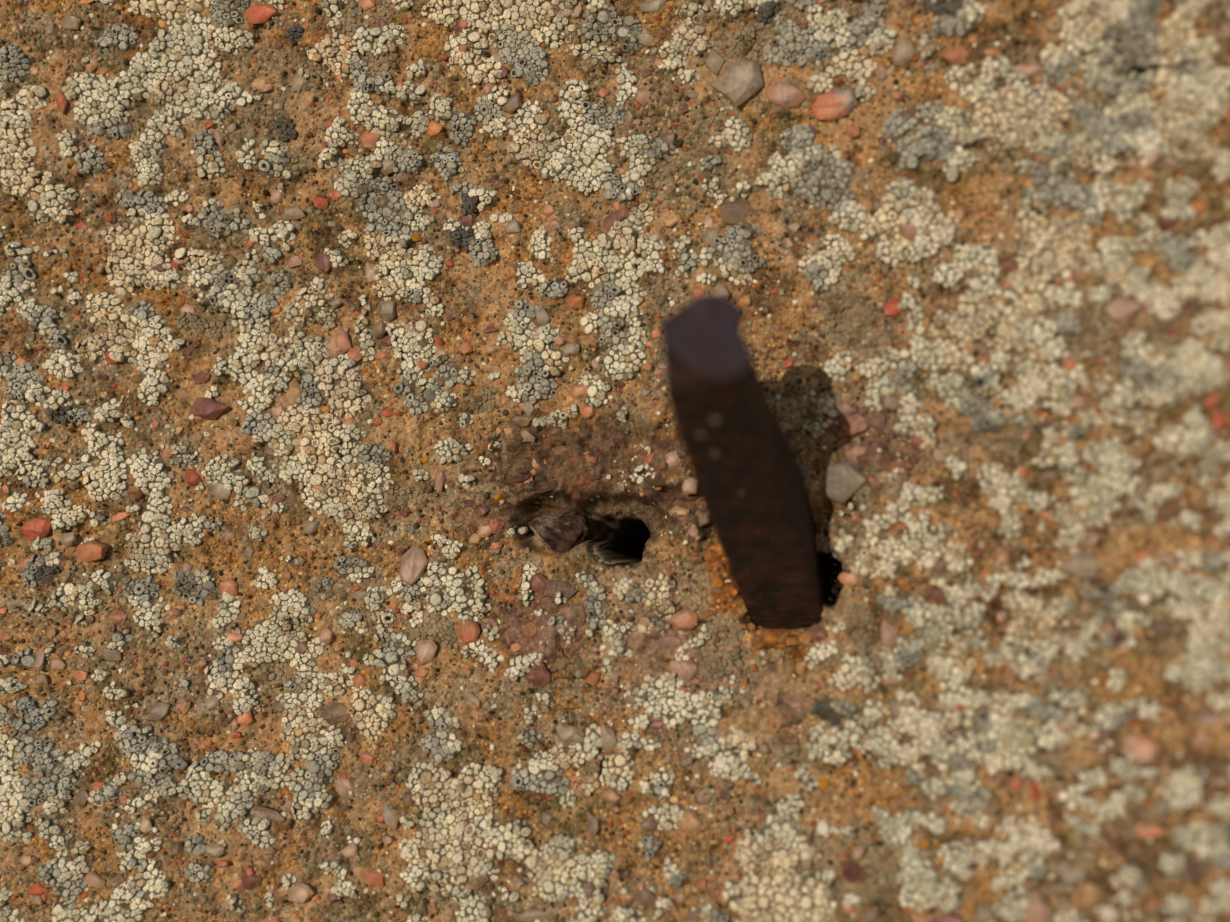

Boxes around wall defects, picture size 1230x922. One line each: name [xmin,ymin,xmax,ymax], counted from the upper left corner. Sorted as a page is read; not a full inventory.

spalling [454,415,713,550]